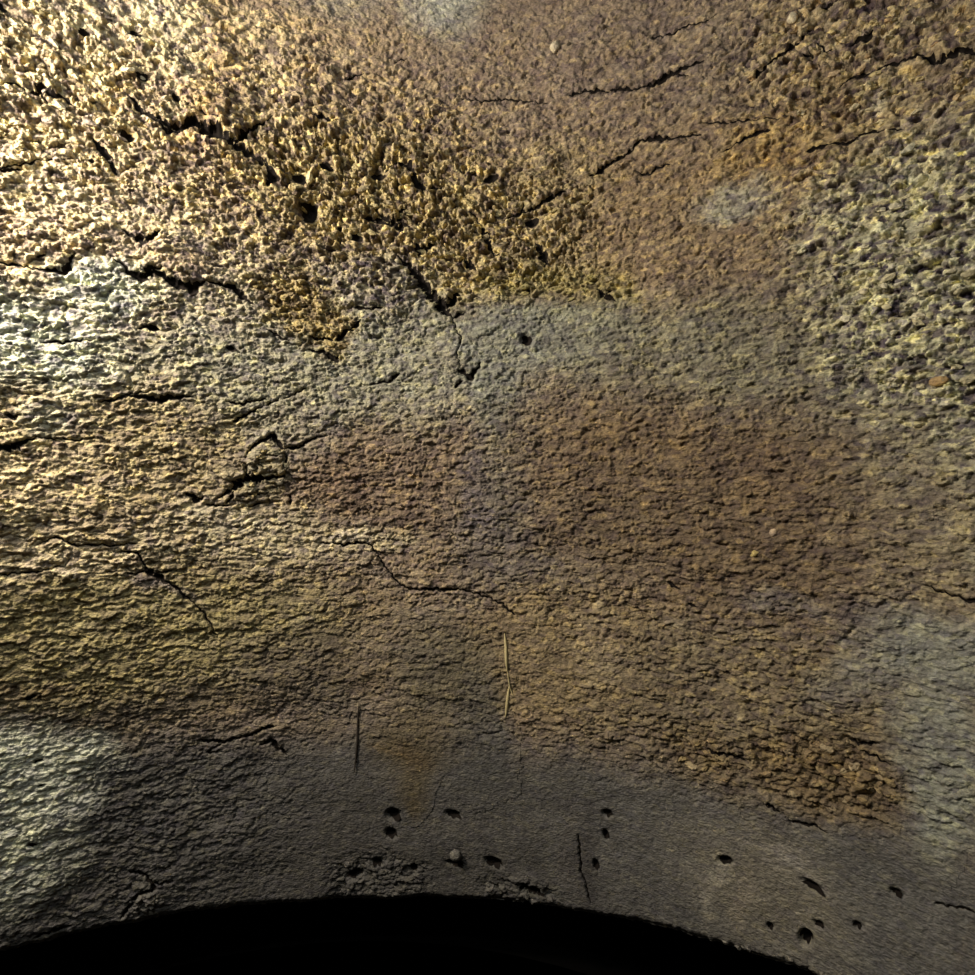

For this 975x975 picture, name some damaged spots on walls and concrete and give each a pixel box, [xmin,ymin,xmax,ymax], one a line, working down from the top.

crack [570,60,705,97]
crack [839,47,975,88]
crack [128,95,275,187]
crack [589,114,789,176]
crack [0,253,75,275]
crack [114,229,254,304]
crack [363,208,481,388]
crack [185,433,328,507]
crack [0,536,217,635]
spalling [320,808,434,900]
spalling [462,857,583,909]
spalling [801,878,825,897]